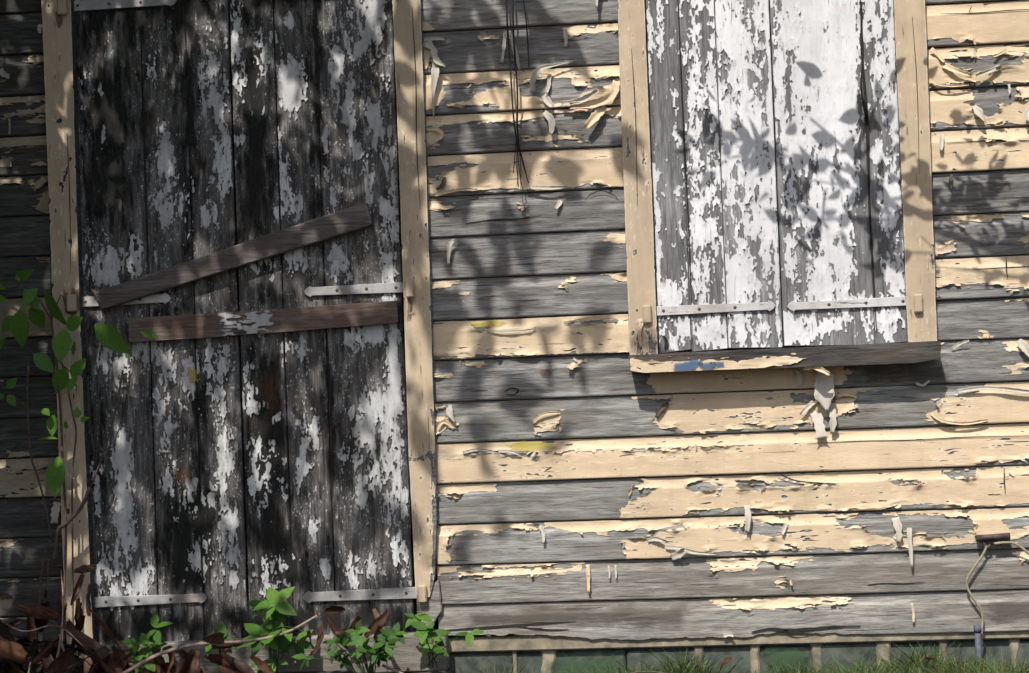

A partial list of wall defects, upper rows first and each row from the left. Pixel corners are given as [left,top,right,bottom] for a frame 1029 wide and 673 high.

peeling [0,0,64,298]
peeling [82,0,310,287]
peeling [321,0,399,284]
peeling [422,0,1029,459]
peeling [90,293,1029,640]